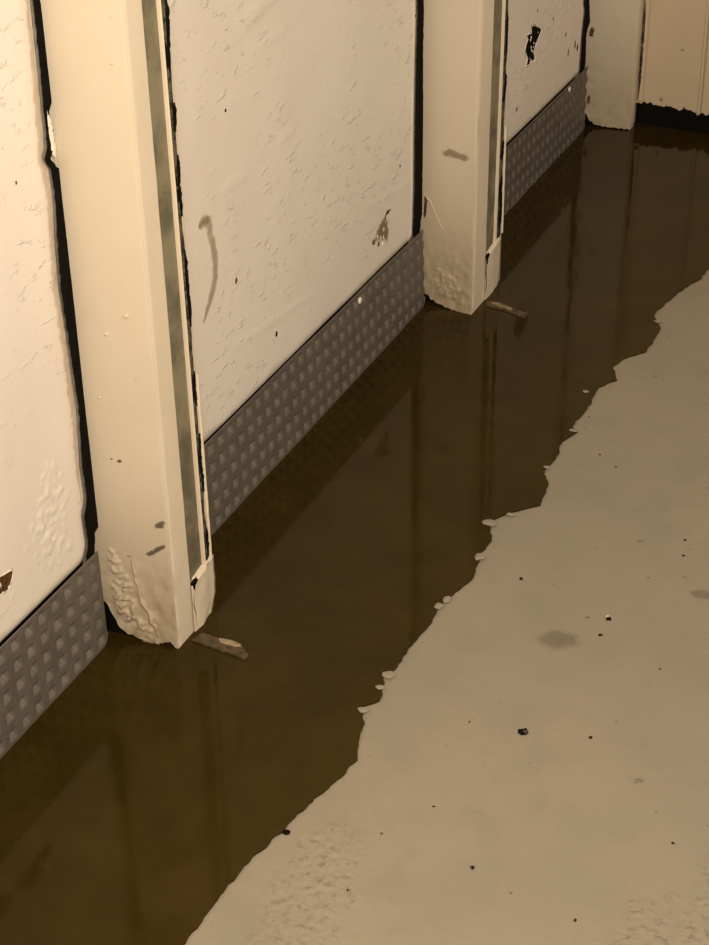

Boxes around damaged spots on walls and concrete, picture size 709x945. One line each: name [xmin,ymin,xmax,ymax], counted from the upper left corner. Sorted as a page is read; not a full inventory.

spalling [524,10,542,67]
peeling [497,0,517,238]
spalling [372,209,391,246]
leakage [199,217,217,324]
peeling [0,569,14,595]